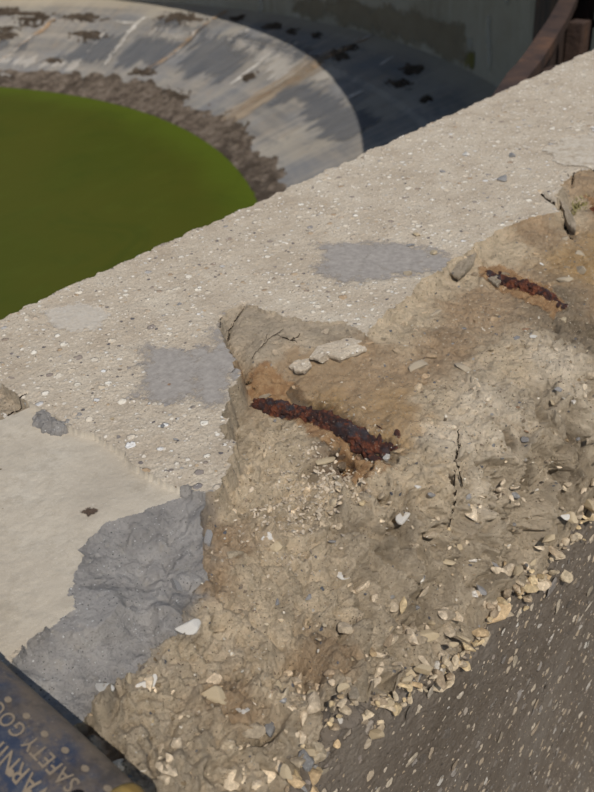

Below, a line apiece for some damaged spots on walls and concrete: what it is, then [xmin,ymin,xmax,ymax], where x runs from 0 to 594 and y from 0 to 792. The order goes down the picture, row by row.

rust [479,264,568,317]
spalling [0,383,82,437]
rust [241,361,401,491]
spalling [74,132,594,792]
spalling [8,484,209,726]